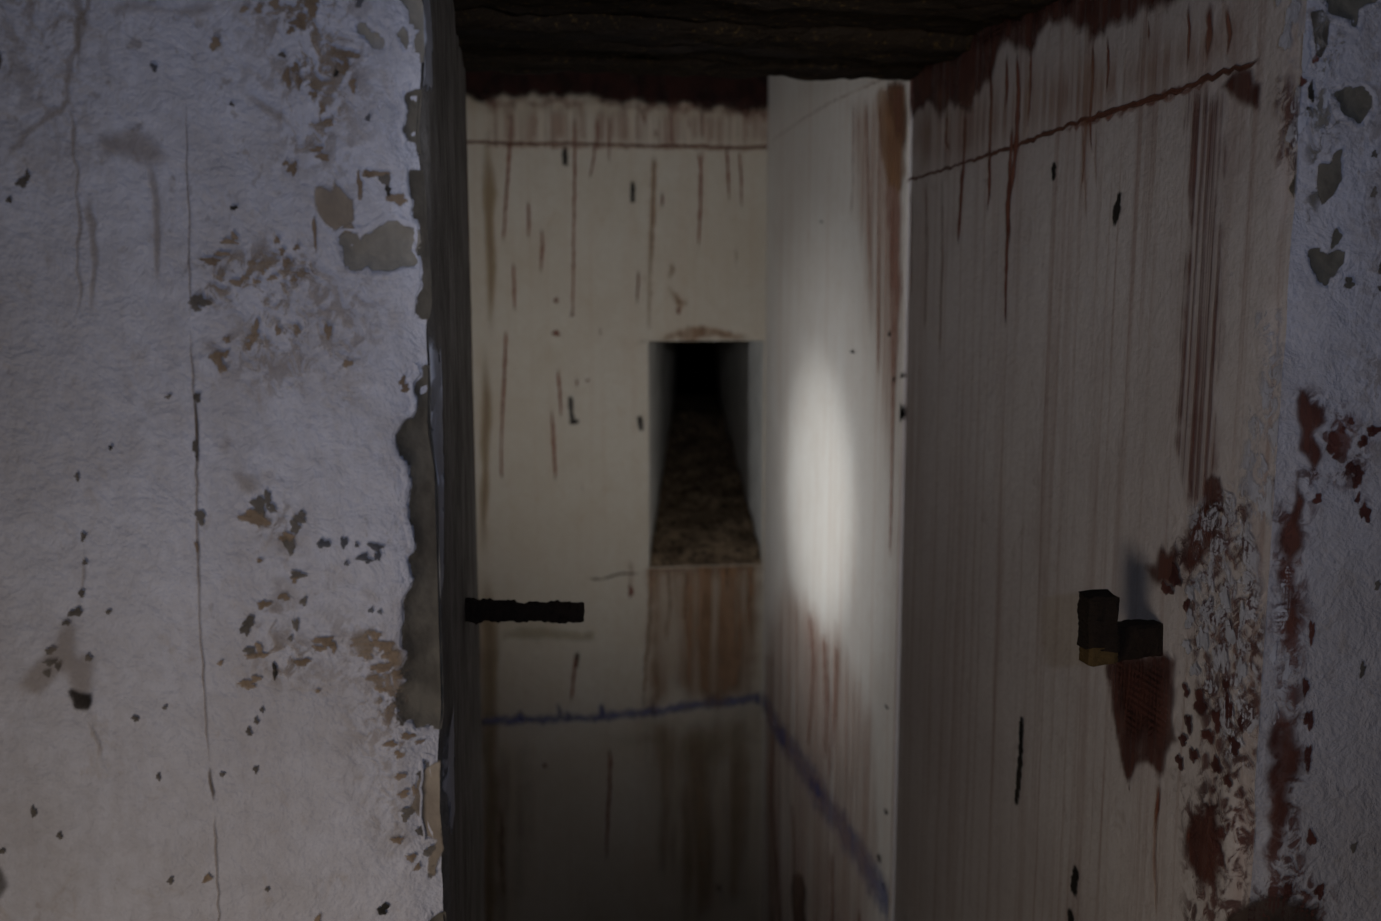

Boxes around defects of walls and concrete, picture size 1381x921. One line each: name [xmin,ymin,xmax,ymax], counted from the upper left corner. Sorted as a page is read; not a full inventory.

peeling [208,318,301,373]
spalling [188,0,433,319]
corrosion [465,71,768,253]
corrosion [851,0,1172,432]
corrosion [1149,98,1223,584]
spalling [1300,228,1355,295]
peeling [1275,0,1381,219]
peeling [1358,427,1381,448]
spalling [238,344,455,879]
corrosion [1243,313,1375,902]
corrosion [1106,655,1175,820]
corrosion [1183,796,1247,921]